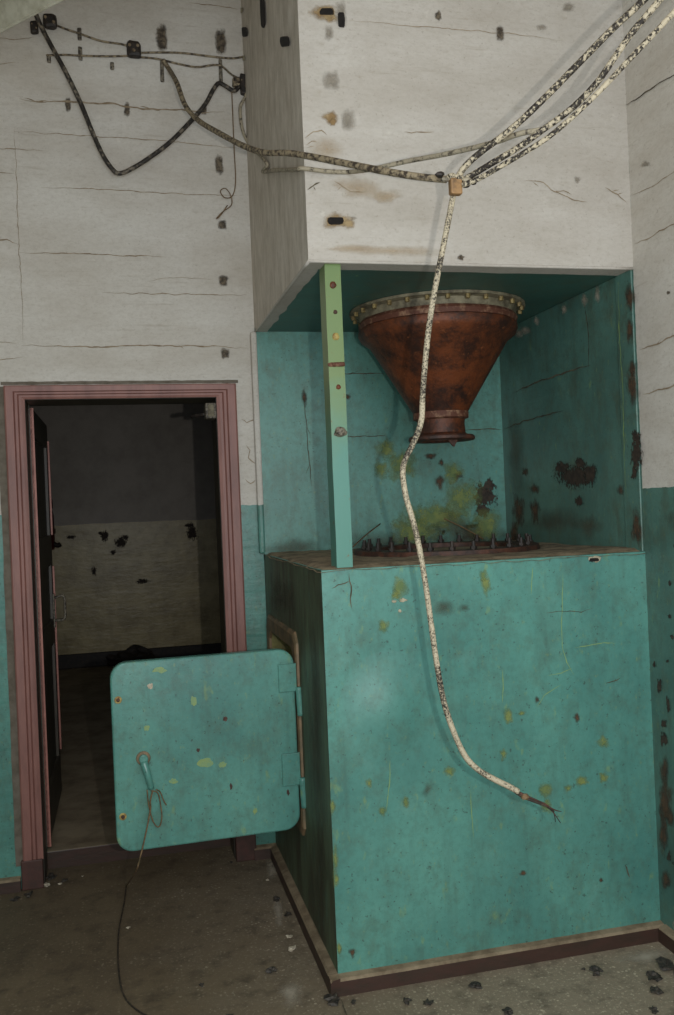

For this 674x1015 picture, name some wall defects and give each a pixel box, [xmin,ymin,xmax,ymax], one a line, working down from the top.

crack [22,98,210,114]
crack [626,75,674,105]
crack [0,127,248,360]
corrosion [625,288,635,308]
corrosion [628,362,637,404]
corrosion [630,429,643,479]
corrosion [659,760,673,850]